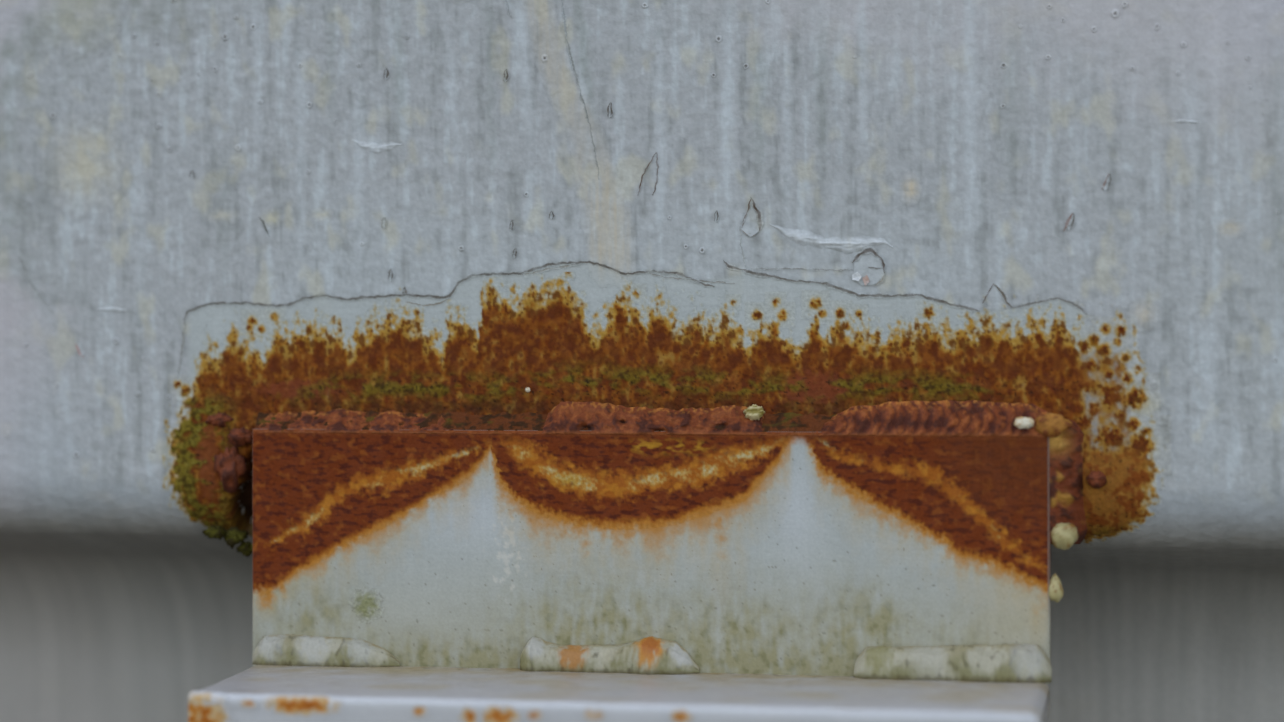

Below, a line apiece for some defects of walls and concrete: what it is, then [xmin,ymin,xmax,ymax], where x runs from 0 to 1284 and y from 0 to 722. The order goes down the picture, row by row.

water stain [0,0,1284,516]
peeling [852,246,886,287]
corrosion [160,272,1172,650]
corrosion [188,691,348,722]
corrosion [412,703,429,718]
corrosion [456,703,544,722]
corrosion [669,707,694,722]